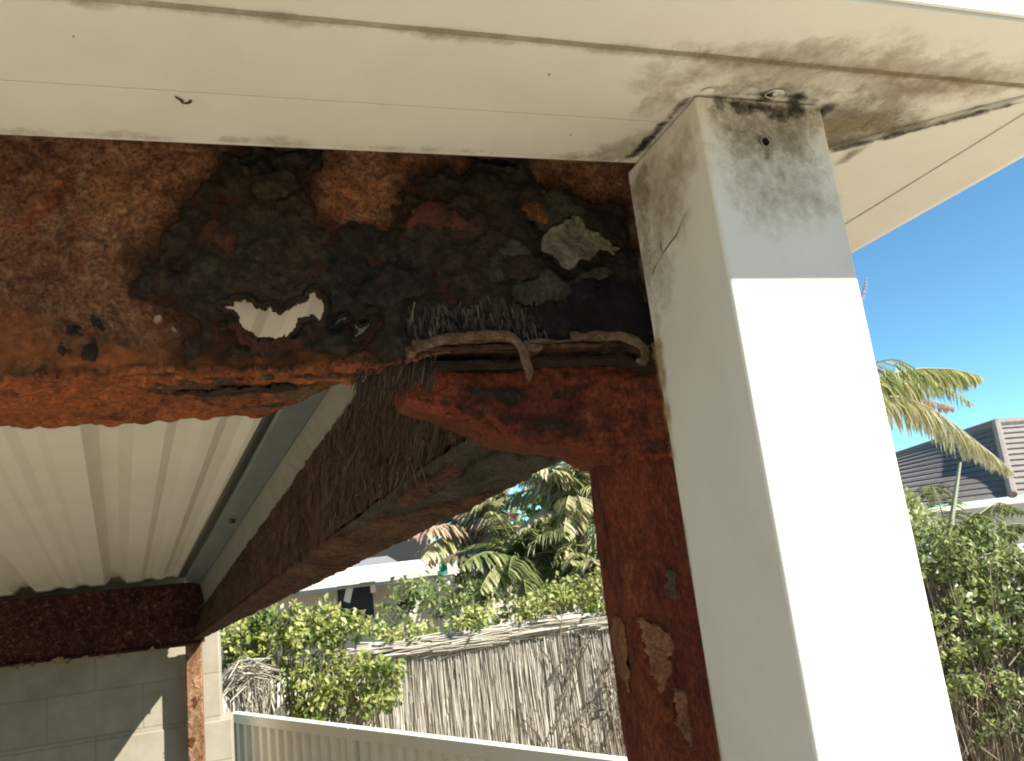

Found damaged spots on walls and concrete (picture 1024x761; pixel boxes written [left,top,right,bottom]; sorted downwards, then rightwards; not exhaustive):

damp [845,63,983,90]
damp [626,100,687,158]
damp [715,90,1021,163]
corrosion [118,145,665,412]
spalling [511,189,655,365]
spalling [58,314,113,362]
corrosion [55,346,140,371]
corrosion [611,615,692,747]
corrosion [187,678,200,761]